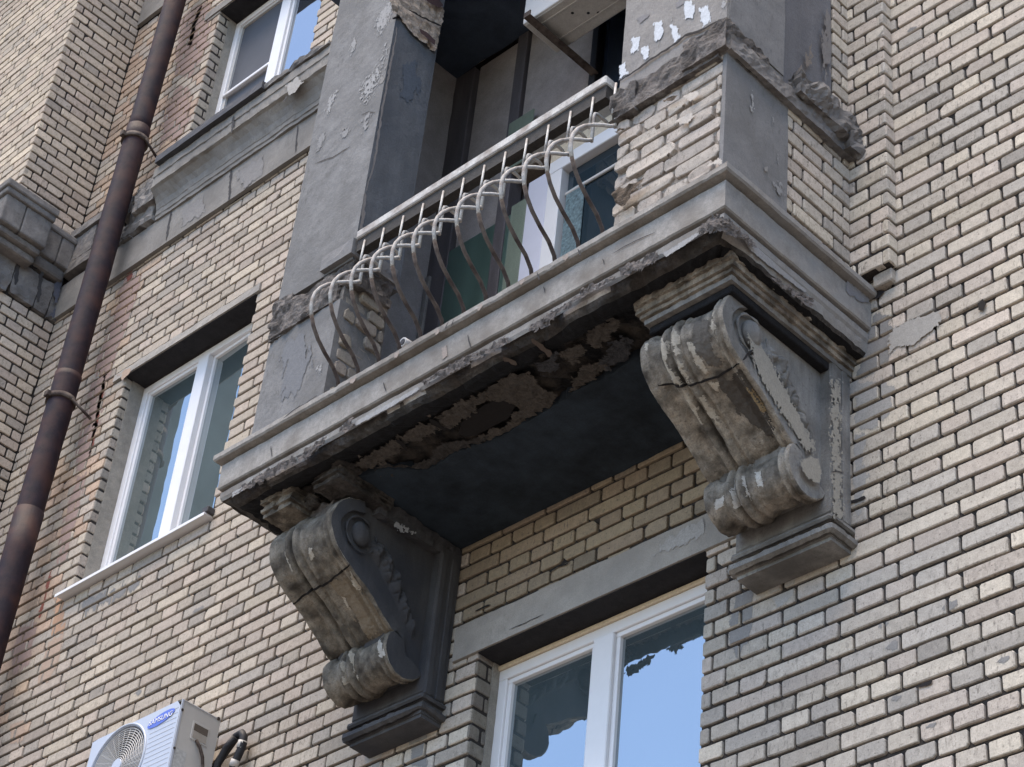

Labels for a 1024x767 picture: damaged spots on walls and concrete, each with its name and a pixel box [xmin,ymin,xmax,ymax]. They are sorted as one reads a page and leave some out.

spalling [340,0,444,138]
peeling [619,0,726,78]
flaking render [611,55,723,226]
spalling [339,213,814,477]
crack [658,349,753,388]
peeling [747,332,866,519]
crack [293,564,350,605]